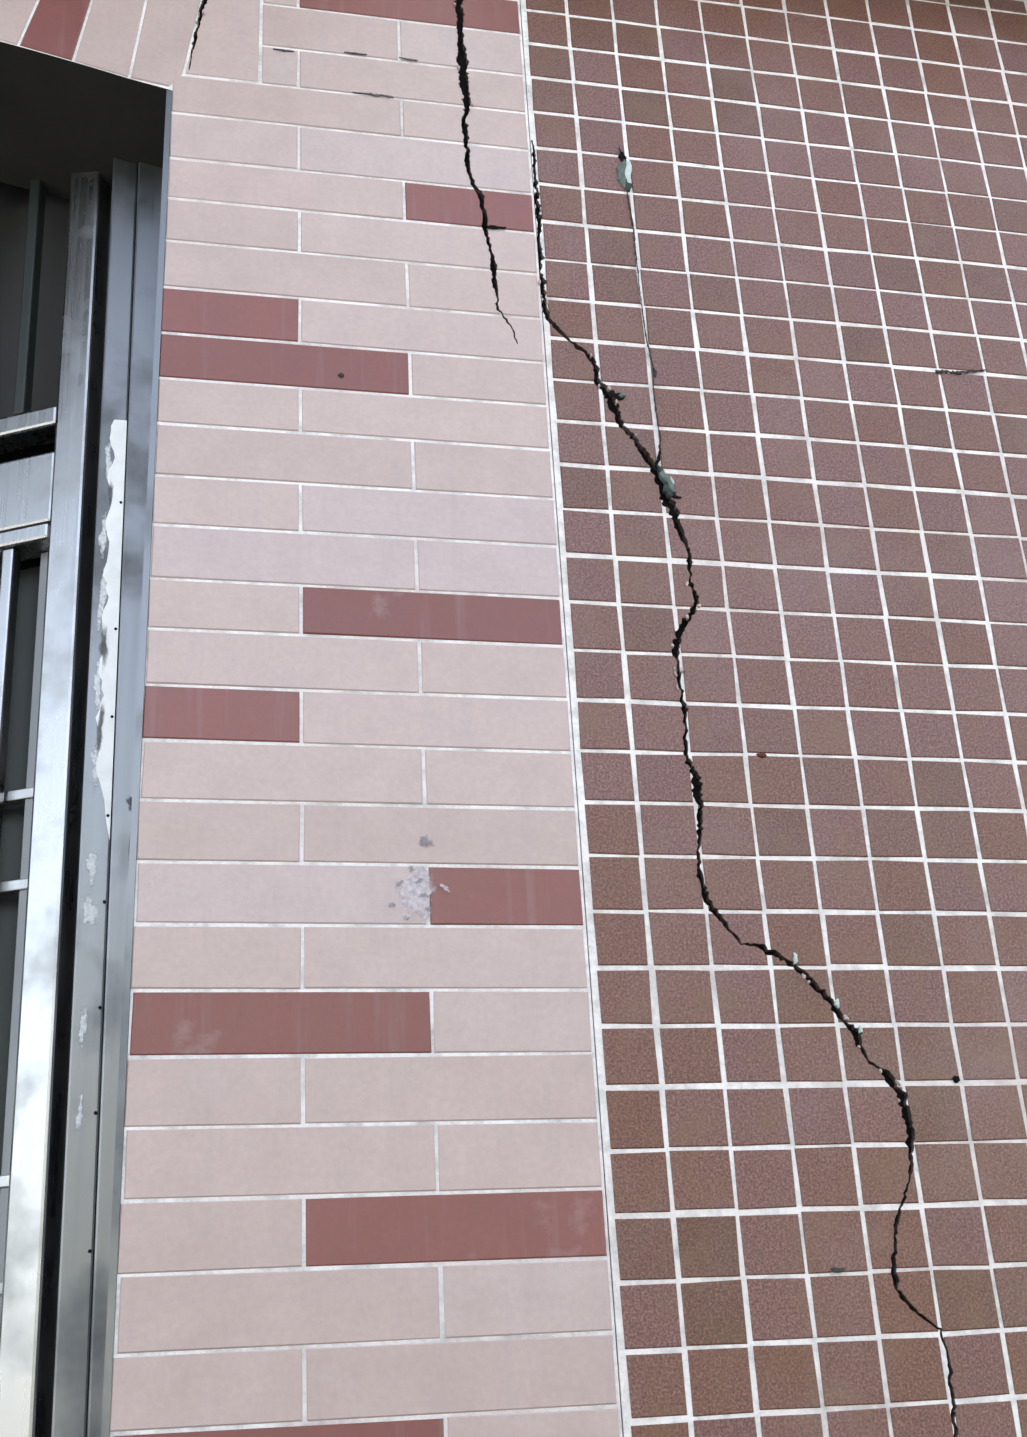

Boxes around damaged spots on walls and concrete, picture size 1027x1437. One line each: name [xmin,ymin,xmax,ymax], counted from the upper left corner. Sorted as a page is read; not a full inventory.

crack [191,0,207,59]
crack [935,368,987,376]
crack [453,0,939,1330]
spalling [389,866,449,920]